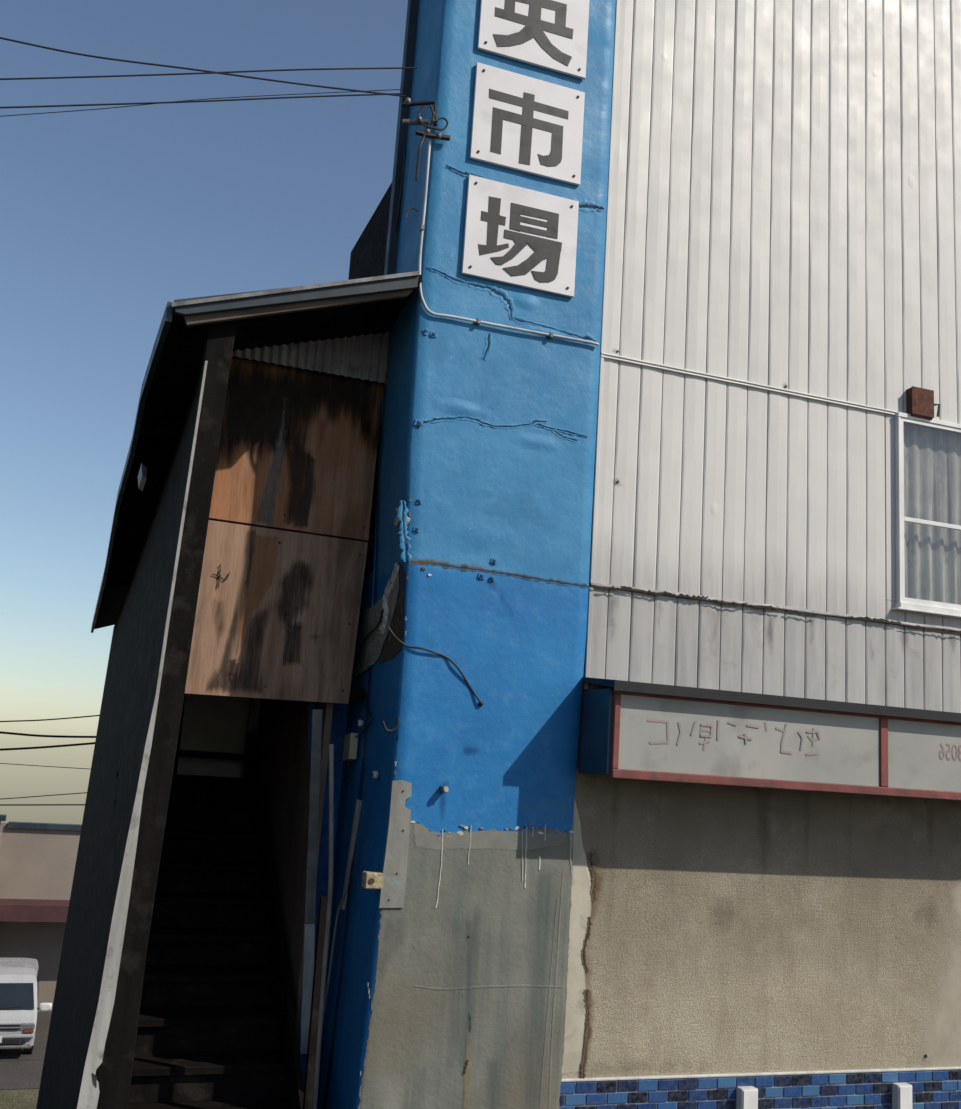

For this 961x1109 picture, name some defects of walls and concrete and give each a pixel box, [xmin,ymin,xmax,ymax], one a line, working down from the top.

crack [426,266,596,360]
crack [420,415,587,443]
water stain [208,414,326,691]
crack [397,500,819,617]
spalling [356,561,408,676]
crack [848,616,961,634]
peeling [358,821,574,1109]
crack [414,852,603,1079]